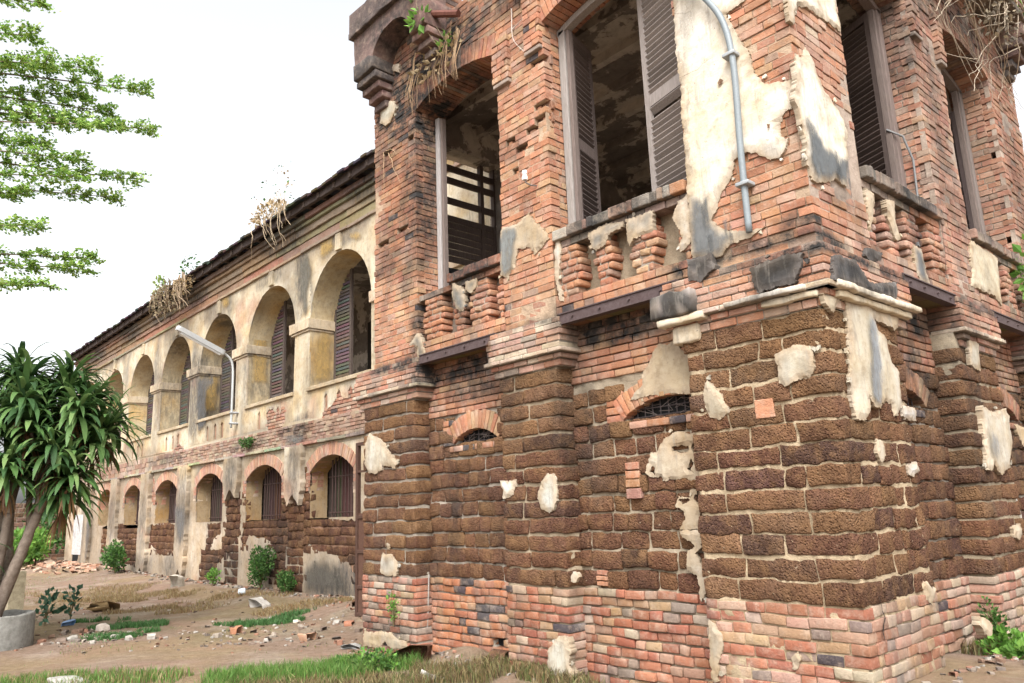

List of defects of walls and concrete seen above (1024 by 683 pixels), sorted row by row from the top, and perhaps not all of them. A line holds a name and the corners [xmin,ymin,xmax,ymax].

peeling [673,0,848,258]
damp [807,118,852,196]
damp [692,199,728,252]
damp [871,319,882,402]
peeling [645,429,707,603]
damp [306,562,344,589]